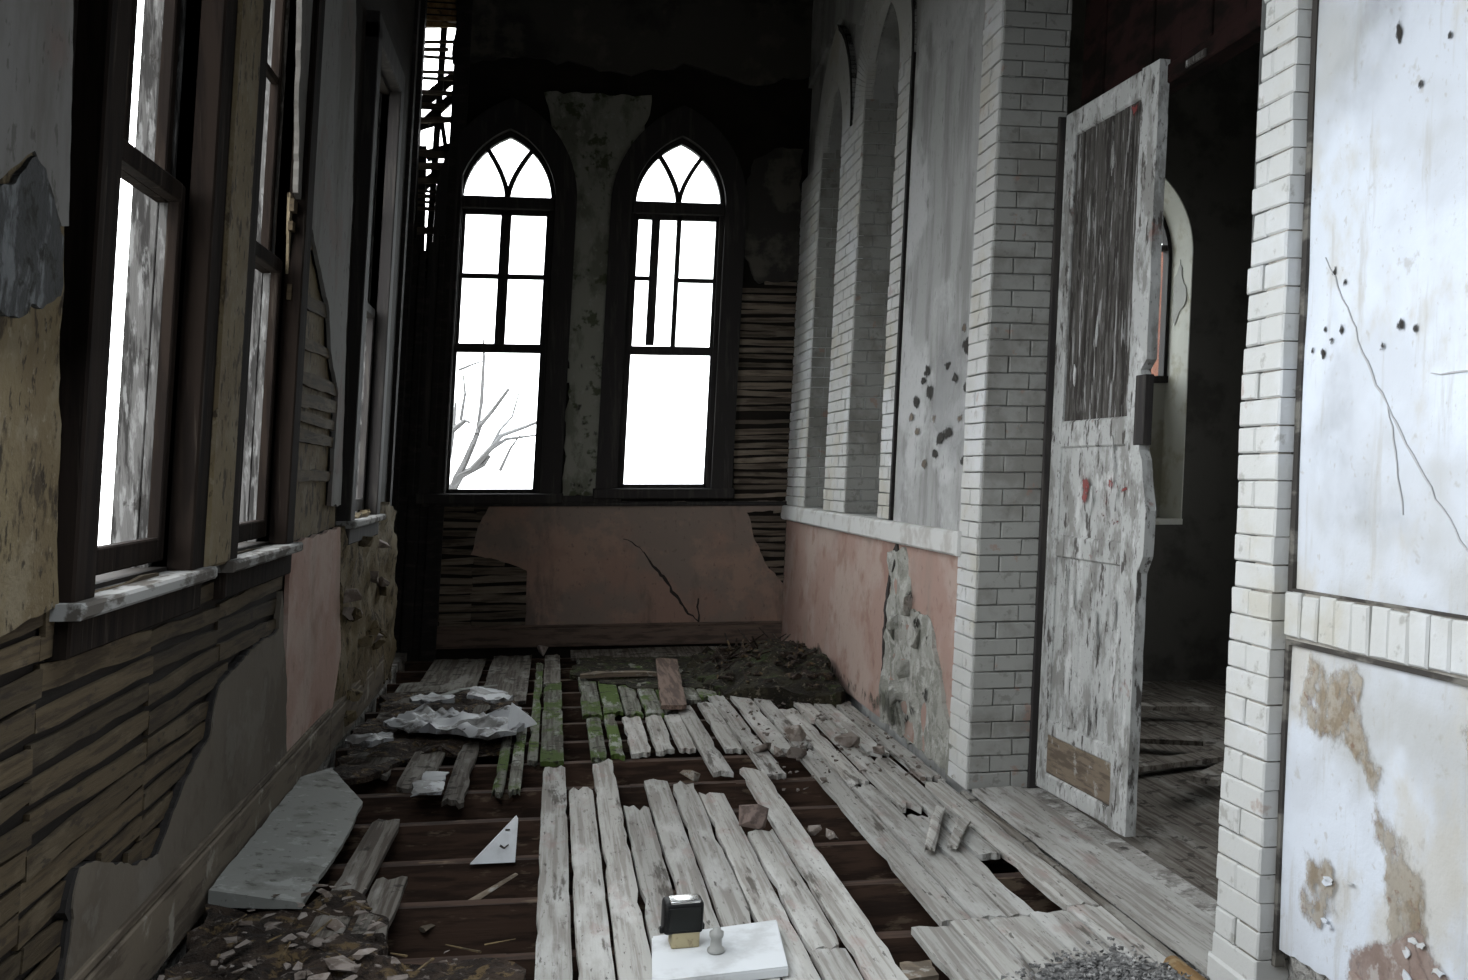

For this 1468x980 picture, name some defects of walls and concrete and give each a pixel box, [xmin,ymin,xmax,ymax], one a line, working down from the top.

flaking render [0,257,283,980]
spalling [286,192,398,727]
crack [624,539,700,626]
flaking render [733,281,797,583]
flaking render [879,547,956,779]
crack [1325,257,1468,552]
flaking render [1300,658,1447,980]